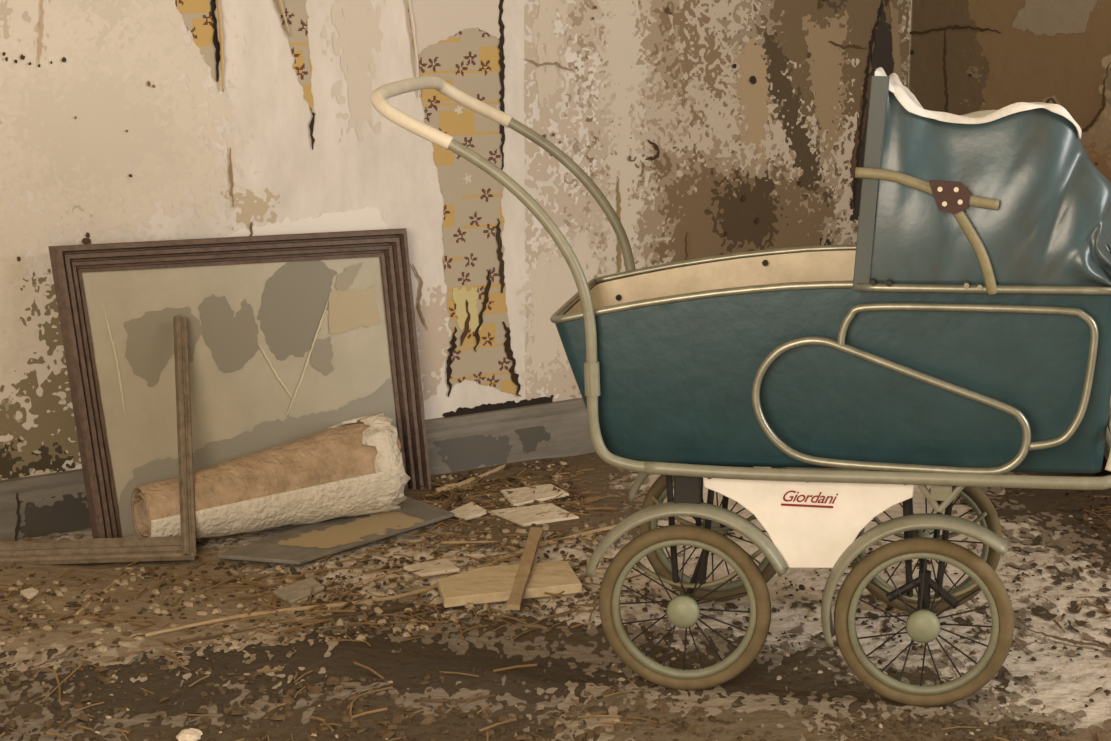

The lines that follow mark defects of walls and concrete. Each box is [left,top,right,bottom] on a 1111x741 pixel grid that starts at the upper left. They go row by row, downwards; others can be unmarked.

spalling [968,0,1111,128]
damp [1080,82,1111,171]